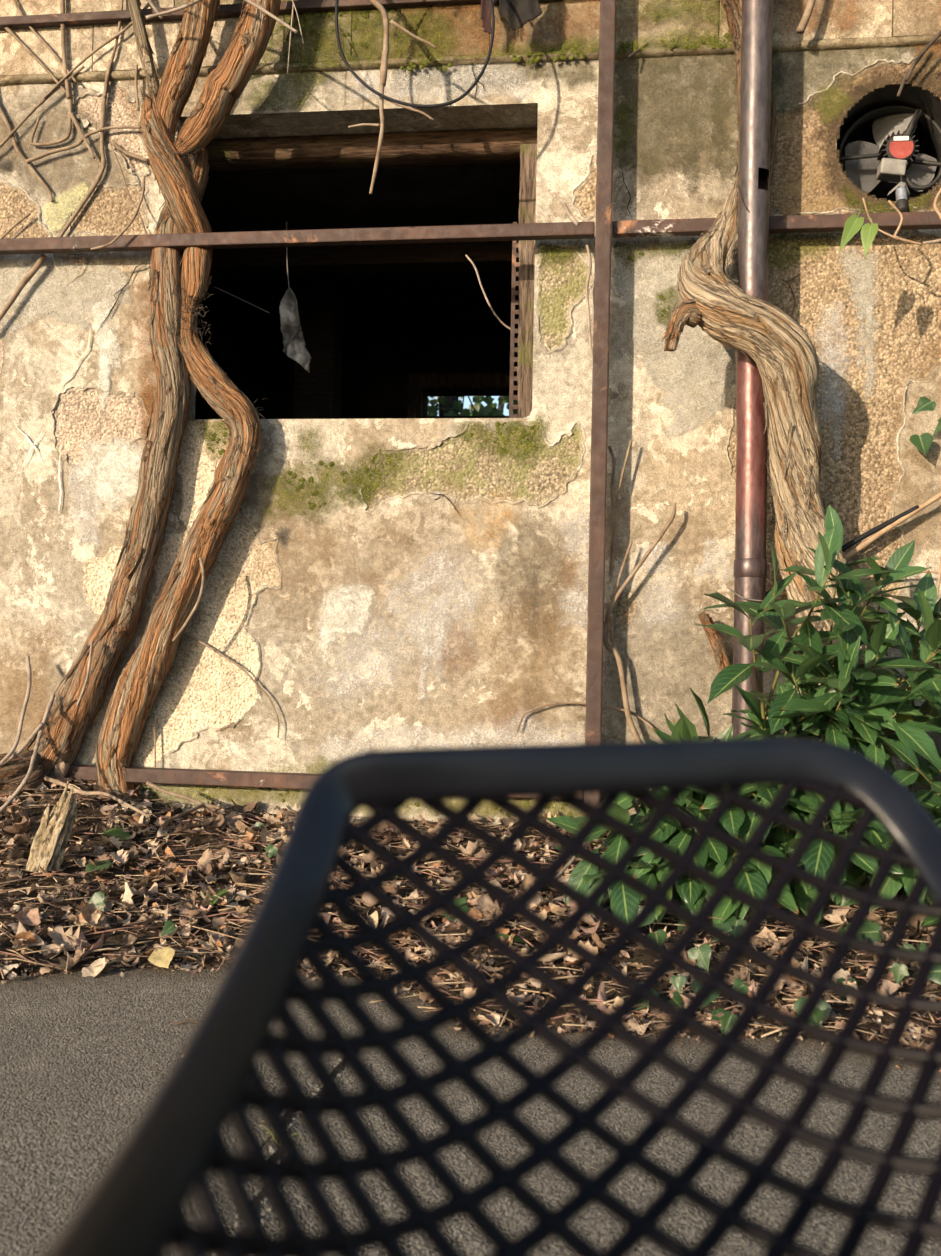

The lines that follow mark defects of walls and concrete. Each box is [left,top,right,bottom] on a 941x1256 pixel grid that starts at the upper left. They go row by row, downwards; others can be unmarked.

flaking render [769,52,941,216]
flaking render [49,385,151,468]
flaking render [81,545,122,615]
flaking render [144,421,229,611]
flaking render [133,506,284,767]
flaking render [724,389,736,489]
flaking render [766,230,941,611]